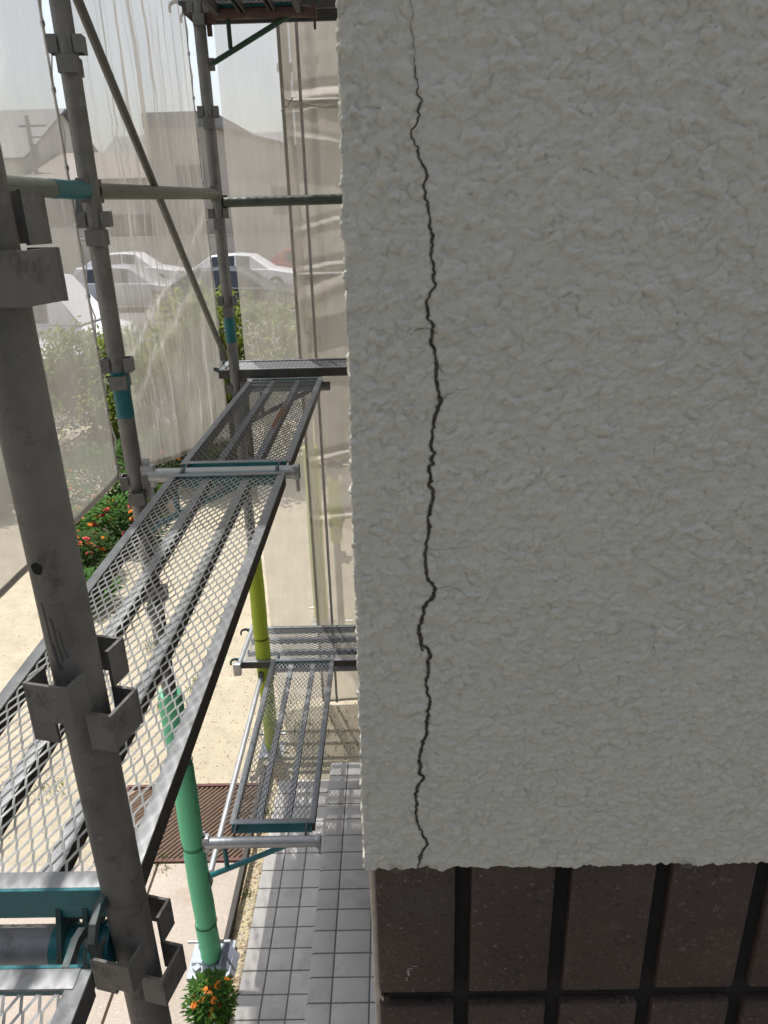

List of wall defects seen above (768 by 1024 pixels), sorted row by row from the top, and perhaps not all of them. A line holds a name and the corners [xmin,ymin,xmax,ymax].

crack [409,0,473,866]